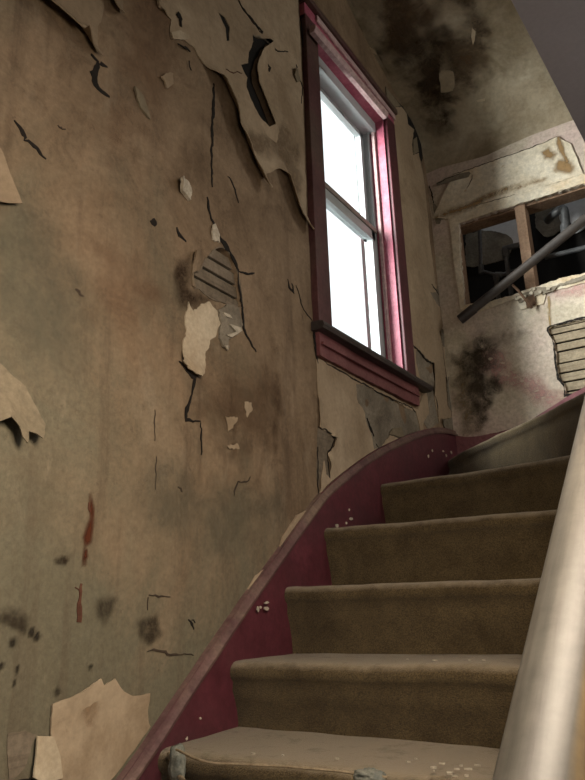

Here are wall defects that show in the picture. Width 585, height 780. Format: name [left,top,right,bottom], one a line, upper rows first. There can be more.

spalling [171,11,192,70]
leakage [381,0,487,133]
crack [14,120,46,160]
peeling [180,176,192,201]
crack [207,69,257,352]
flaking render [535,198,585,237]
flaking render [182,301,243,376]
crack [179,361,203,455]
flaking render [356,346,453,449]
leakage [455,339,501,435]
flaking render [316,427,336,494]
peeling [7,679,150,780]